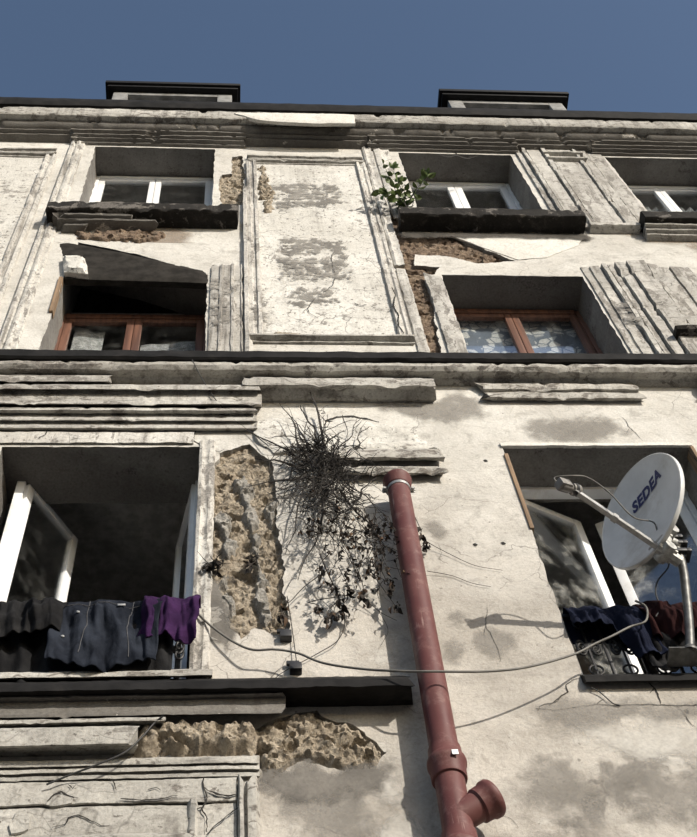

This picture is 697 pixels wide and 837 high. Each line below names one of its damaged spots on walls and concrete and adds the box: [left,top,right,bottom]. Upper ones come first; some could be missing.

spalling [74,229,166,244]
crack [390,288,404,334]
spalling [390,213,505,353]
water stain [377,395,481,421]
water stain [528,419,619,440]
spalling [210,448,290,640]
spalling [128,713,383,772]
crack [47,784,110,827]
crack [109,778,178,801]
crack [188,777,237,835]
water stain [259,758,396,837]
water stain [533,762,601,828]